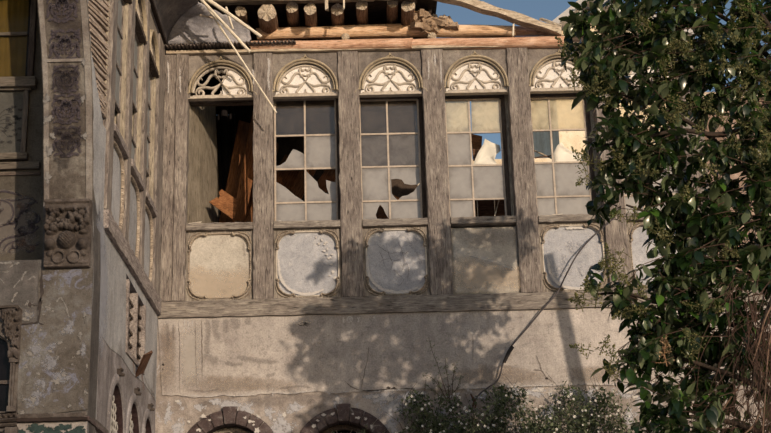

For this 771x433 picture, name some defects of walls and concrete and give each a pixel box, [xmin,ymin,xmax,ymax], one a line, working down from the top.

crack [366,234,425,294]
peeling [20,312,88,414]
peeling [18,423,86,433]
peeling [164,388,312,433]
peeling [312,391,348,428]
peeling [352,389,427,433]